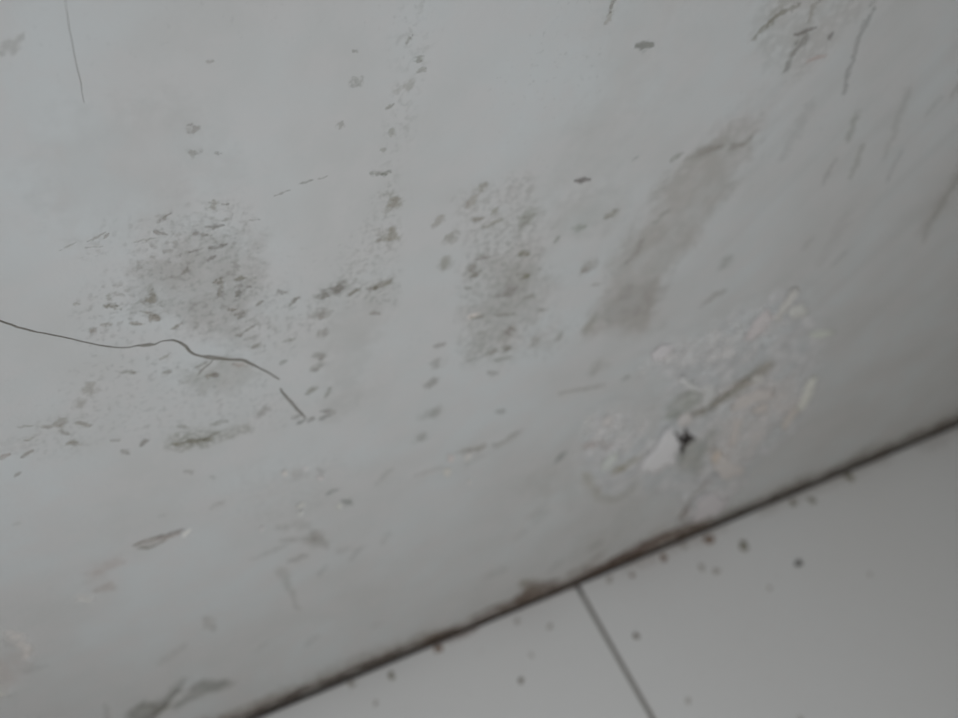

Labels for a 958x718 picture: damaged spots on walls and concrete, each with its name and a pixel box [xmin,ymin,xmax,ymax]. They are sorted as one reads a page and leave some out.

crack [0,320,306,419]
peeling [563,275,838,531]